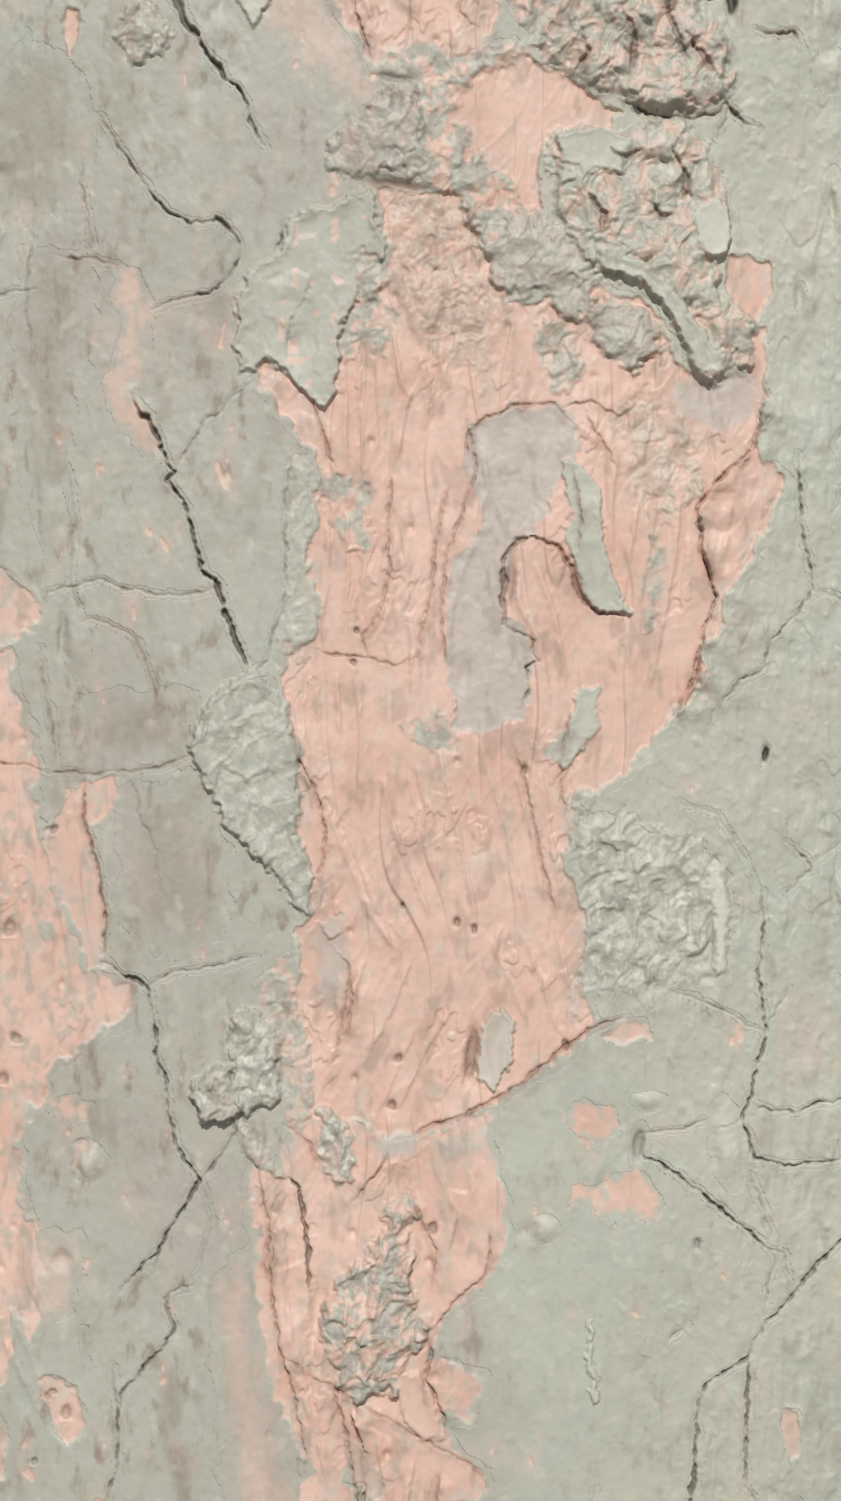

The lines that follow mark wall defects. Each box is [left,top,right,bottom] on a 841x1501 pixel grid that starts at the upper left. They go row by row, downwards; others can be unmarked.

crack [167,0,271,151]
crack [0,111,292,355]
crack [712,449,841,728]
peeling [231,0,795,1501]
peeling [0,568,139,1390]
crack [0,376,424,1501]
crack [403,1013,634,1144]
crack [632,829,841,1501]
peeling [38,1374,88,1450]
peeling [781,1408,802,1464]